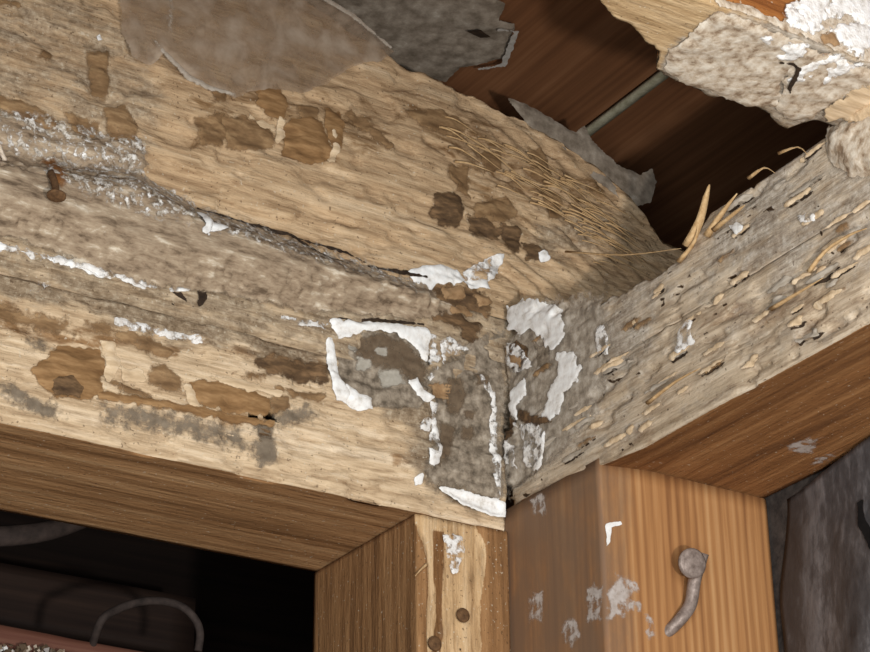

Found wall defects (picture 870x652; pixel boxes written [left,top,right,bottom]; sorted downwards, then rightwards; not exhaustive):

peeling [120,0,394,165]
peeling [664,0,870,122]
rust [43,159,66,186]
peeling [31,164,550,466]
crack [197,207,428,278]
crack [339,317,424,326]
water stain [246,291,611,499]
peeling [439,298,661,517]
water stain [675,320,695,353]
water stain [729,222,743,235]
peeling [752,200,870,346]
peeling [800,140,828,163]